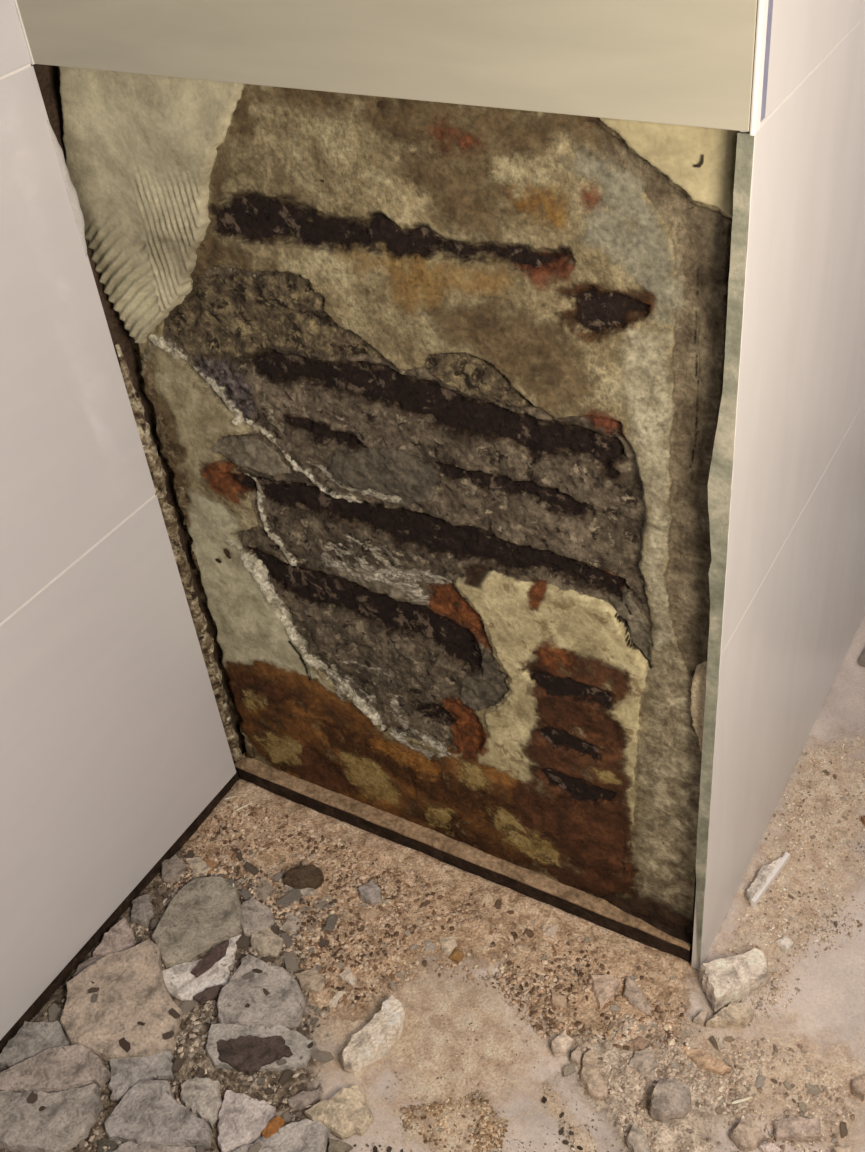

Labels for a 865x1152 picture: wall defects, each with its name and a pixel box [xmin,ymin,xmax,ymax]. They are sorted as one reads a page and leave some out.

rust [209,190,575,289]
crack [288,641,310,681]
rust [200,461,626,676]
rust [243,348,626,482]
spalling [140,123,732,921]
rust [225,641,638,897]